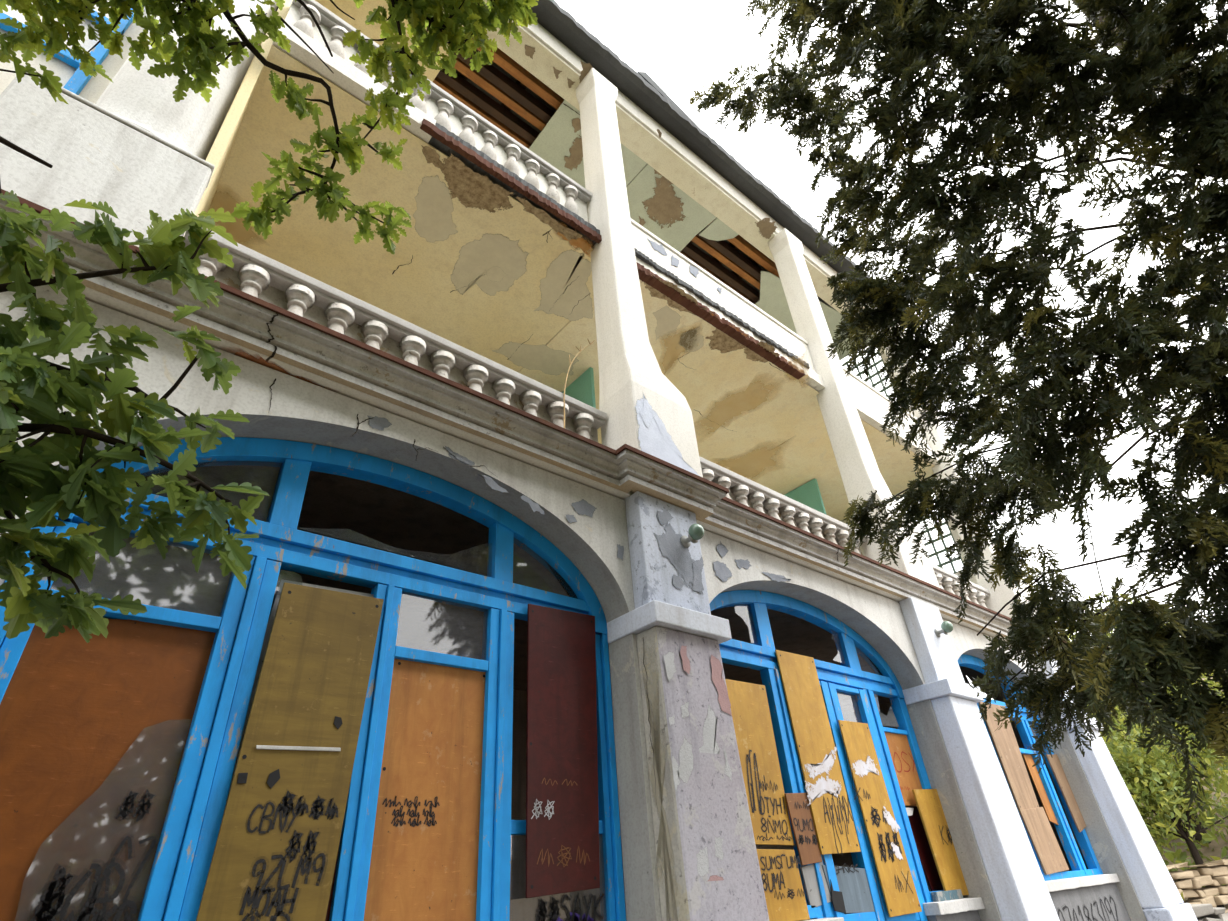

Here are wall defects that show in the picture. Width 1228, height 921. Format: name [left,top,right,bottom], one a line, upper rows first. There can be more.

peeling [413,118,600,321]
peeling [639,169,699,277]
peeling [755,217,778,239]
spalling [636,262,805,379]
peeling [566,499,596,523]